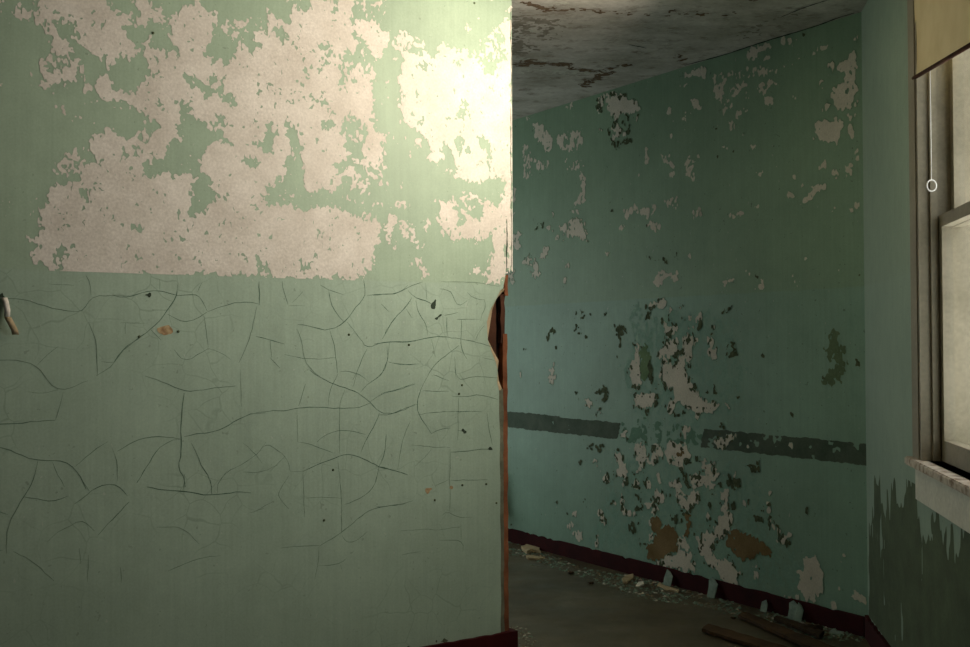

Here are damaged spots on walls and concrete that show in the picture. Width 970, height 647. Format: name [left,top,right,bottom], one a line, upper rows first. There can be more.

water stain [512,12,572,56]
peeling [595,91,641,150]
peeling [684,33,805,131]
peeling [786,35,859,205]
peeling [0,0,590,390]
crack [0,135,512,581]
peeling [784,554,867,622]